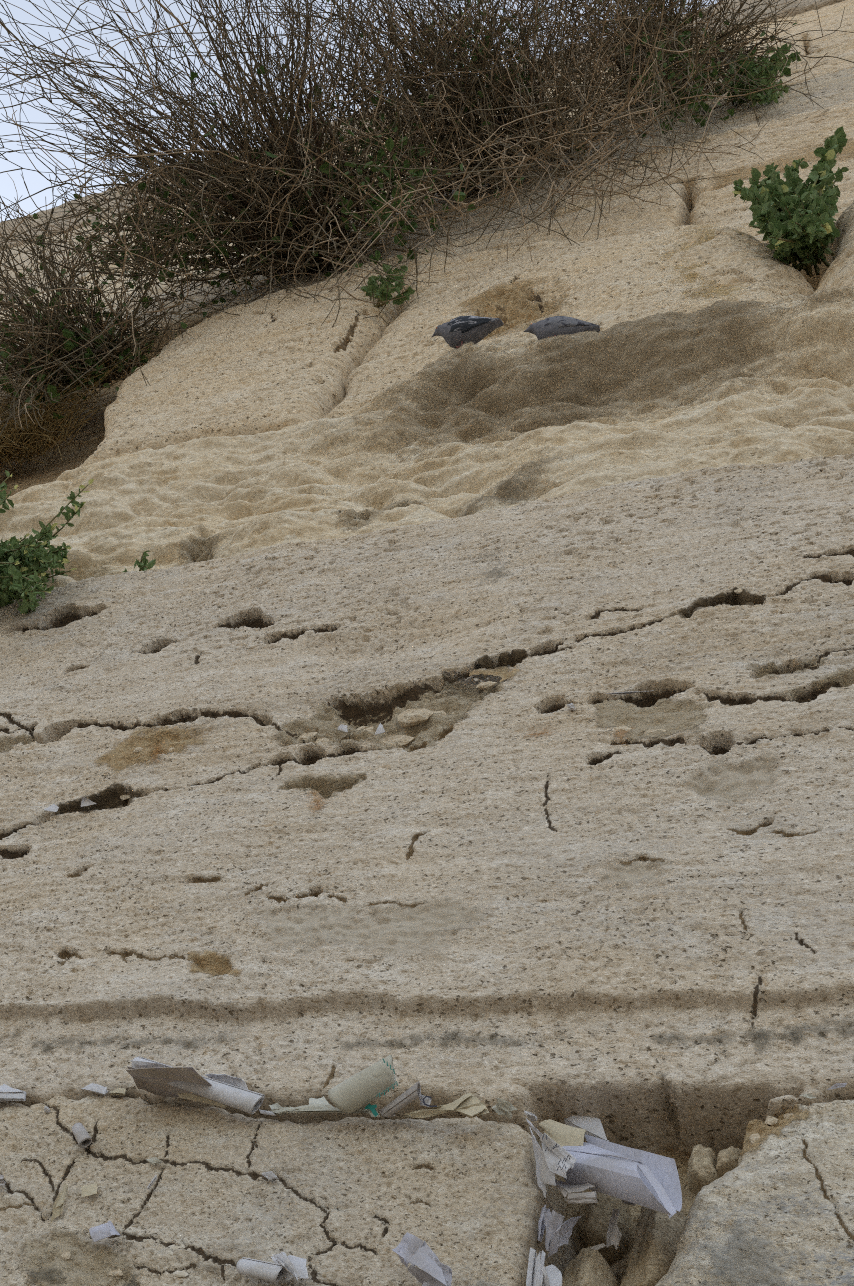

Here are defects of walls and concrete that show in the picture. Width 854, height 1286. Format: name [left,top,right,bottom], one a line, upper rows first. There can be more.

crack [762,549,854,605]
crack [219,617,337,643]
crack [531,608,664,657]
crack [0,823,36,860]
spalling [55,726,206,815]
crack [0,672,470,791]
spalling [280,772,366,799]
spalling [278,649,528,752]
crack [538,647,854,765]
crack [727,822,817,837]
crack [0,1103,433,1286]
crack [803,1139,854,1240]